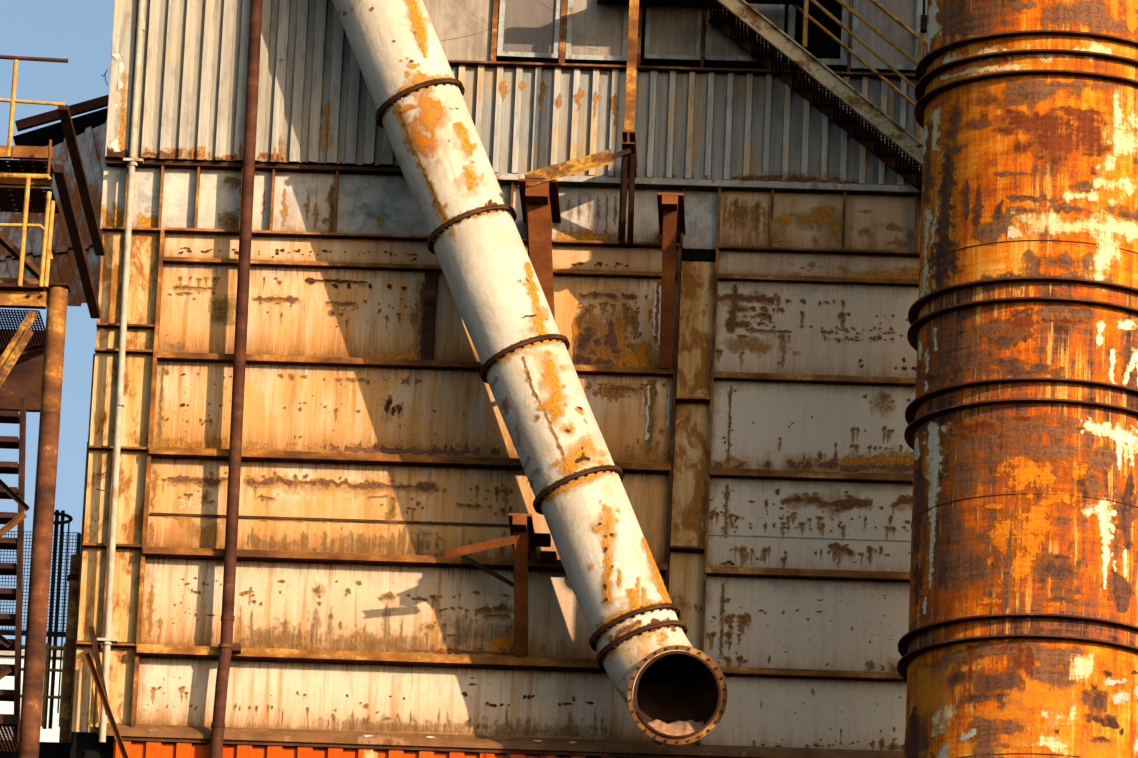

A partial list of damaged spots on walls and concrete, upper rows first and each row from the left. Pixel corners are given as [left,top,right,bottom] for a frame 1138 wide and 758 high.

corrosion [927,0,1138,36]
corrosion [391,0,484,193]
corrosion [837,79,1138,303]
corrosion [168,276,236,325]
corrosion [247,377,500,457]
corrosion [479,261,668,501]
corrosion [715,285,908,370]
corrosion [894,306,1095,382]
corrosion [149,470,228,546]
corrosion [244,471,514,528]
corrosion [709,385,1138,614]
corrosion [589,500,677,651]